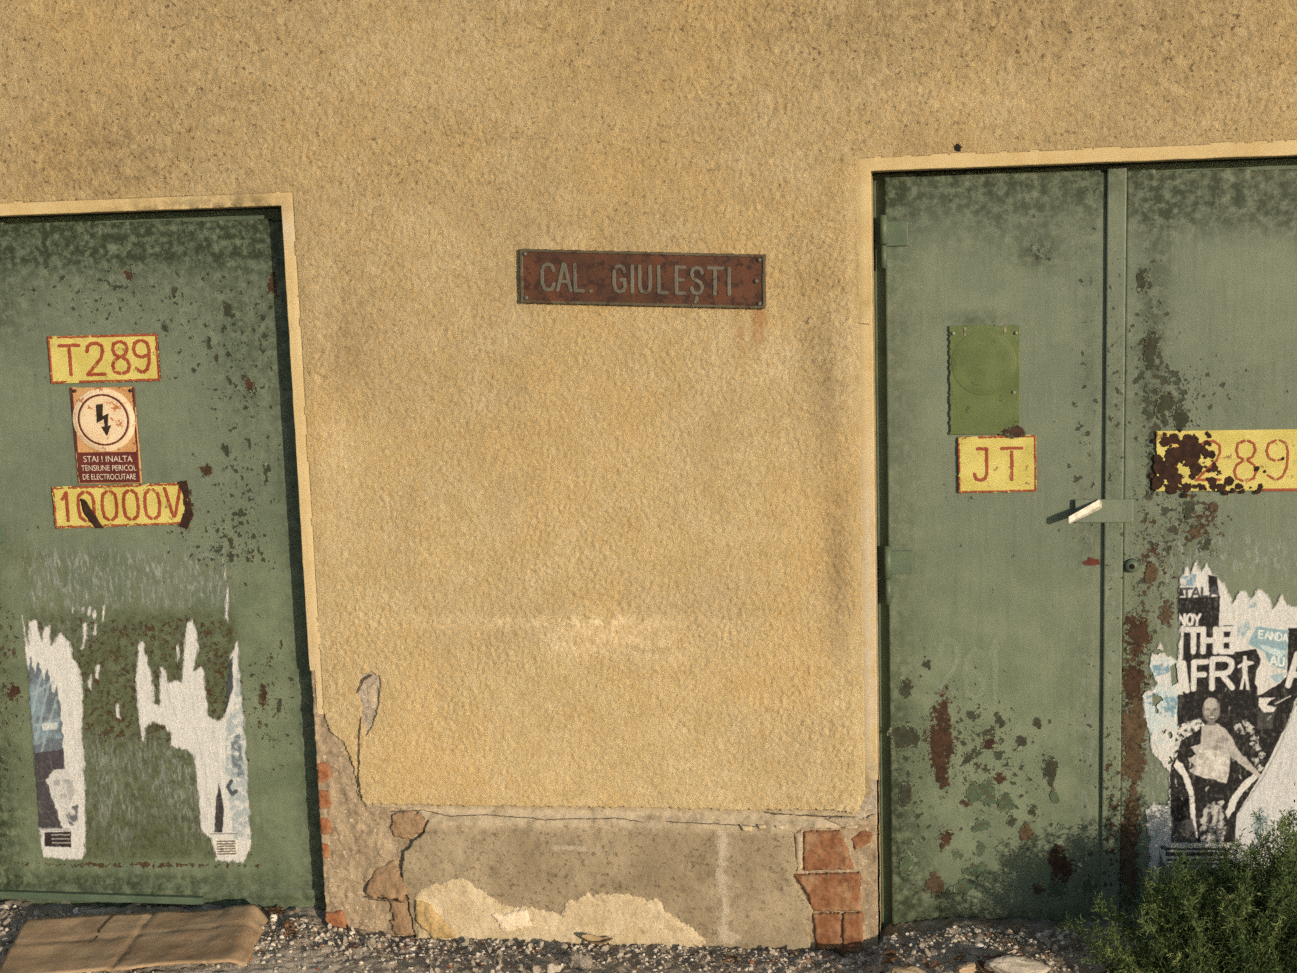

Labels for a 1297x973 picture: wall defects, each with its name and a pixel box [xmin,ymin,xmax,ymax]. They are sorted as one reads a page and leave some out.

corrosion [1144,559,1159,591]
corrosion [923,683,970,808]
corrosion [981,734,1002,752]
corrosion [1120,597,1174,923]
corrosion [992,773,1007,785]
spalling [311,670,706,948]
corrosion [936,825,954,853]
corrosion [1016,821,1035,842]
spalling [740,780,878,953]
corrosion [923,869,946,900]
corrosion [1033,842,1079,895]